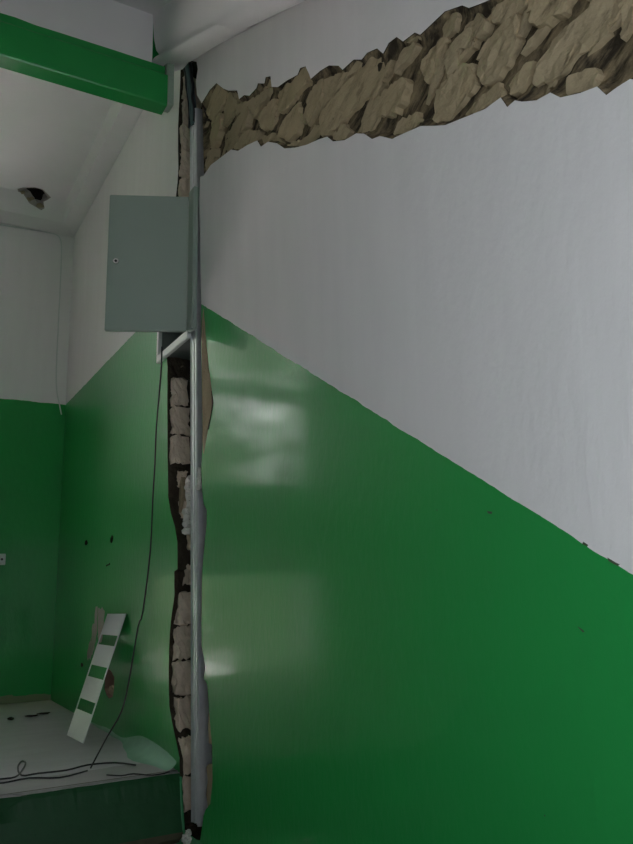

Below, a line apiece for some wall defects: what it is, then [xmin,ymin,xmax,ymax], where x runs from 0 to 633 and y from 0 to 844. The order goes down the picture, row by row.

spalling [202,0,633,174]
spalling [18,187,51,210]
peeling [201,309,213,453]